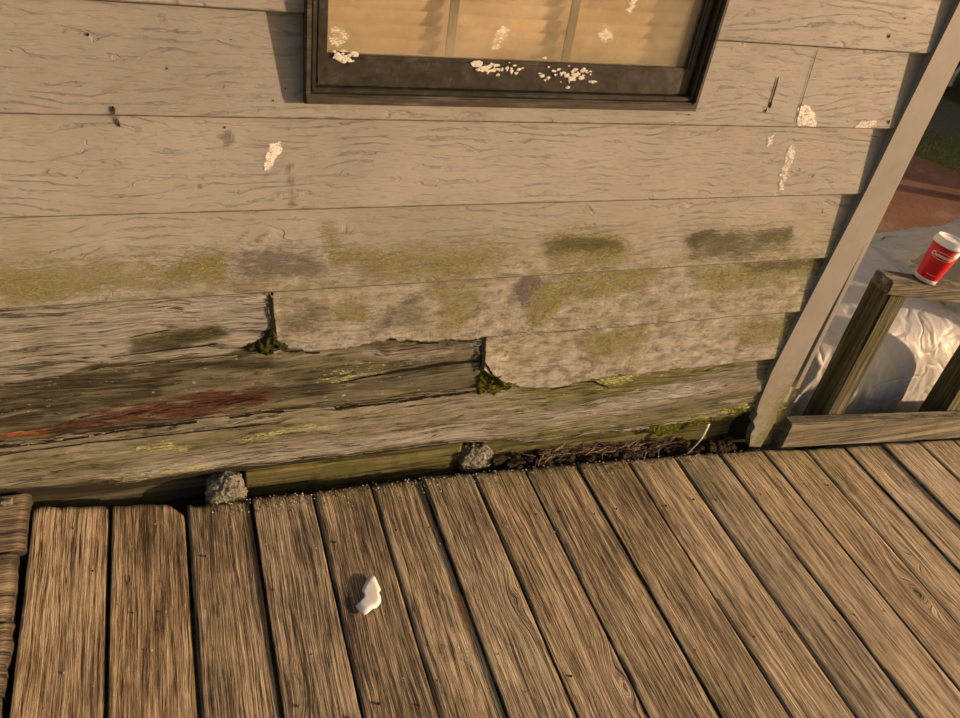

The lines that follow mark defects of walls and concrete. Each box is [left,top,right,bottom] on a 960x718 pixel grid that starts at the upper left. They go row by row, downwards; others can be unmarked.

crack [765,76,779,113]
water stain [546,237,622,256]
water stain [749,258,823,273]
crack [268,293,320,354]
crack [334,337,504,410]
water stain [0,388,276,440]